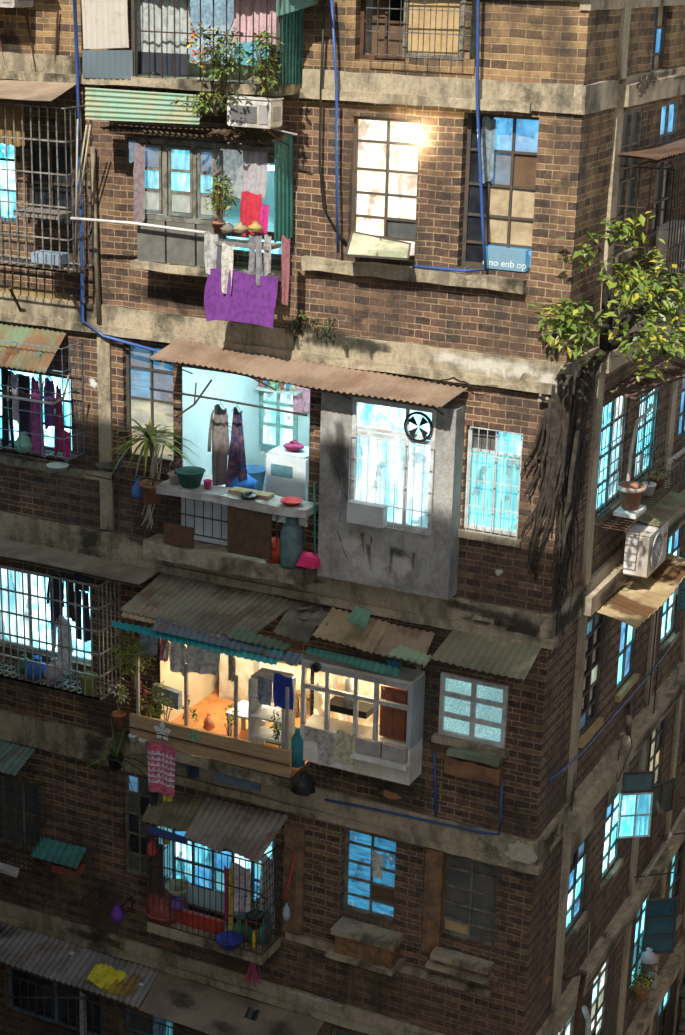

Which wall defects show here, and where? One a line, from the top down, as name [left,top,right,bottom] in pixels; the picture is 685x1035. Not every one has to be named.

water stain [330,424,347,487]
water stain [338,536,415,583]